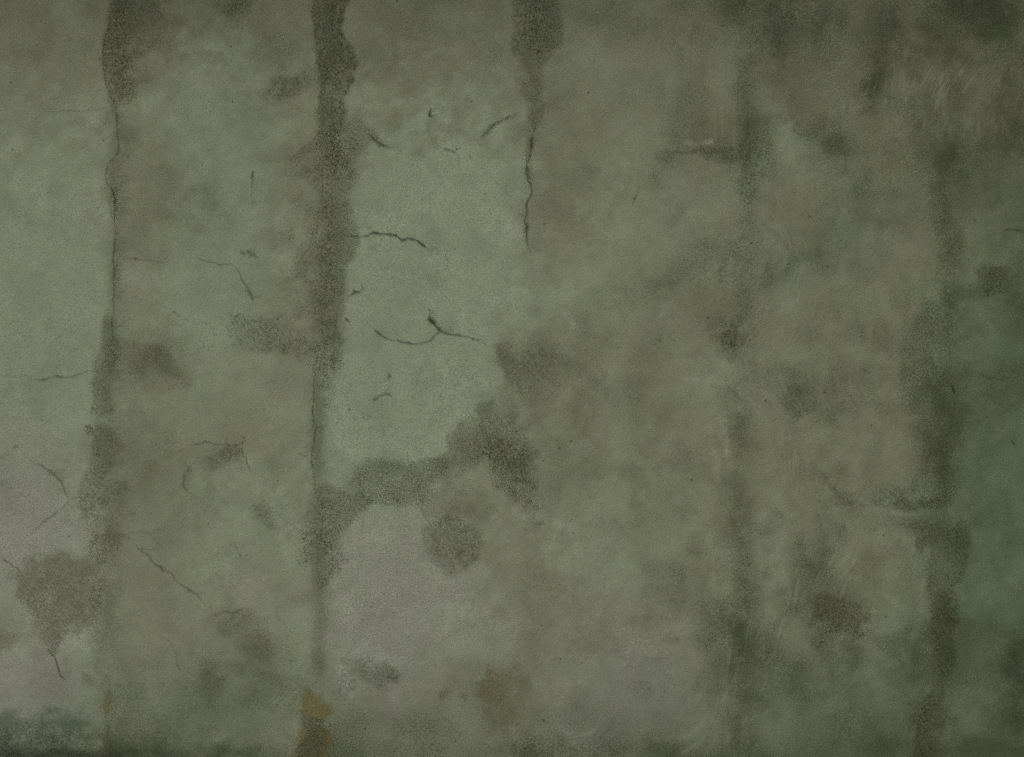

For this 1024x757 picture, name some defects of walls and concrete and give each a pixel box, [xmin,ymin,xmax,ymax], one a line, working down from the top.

leakage [311,0,368,370]